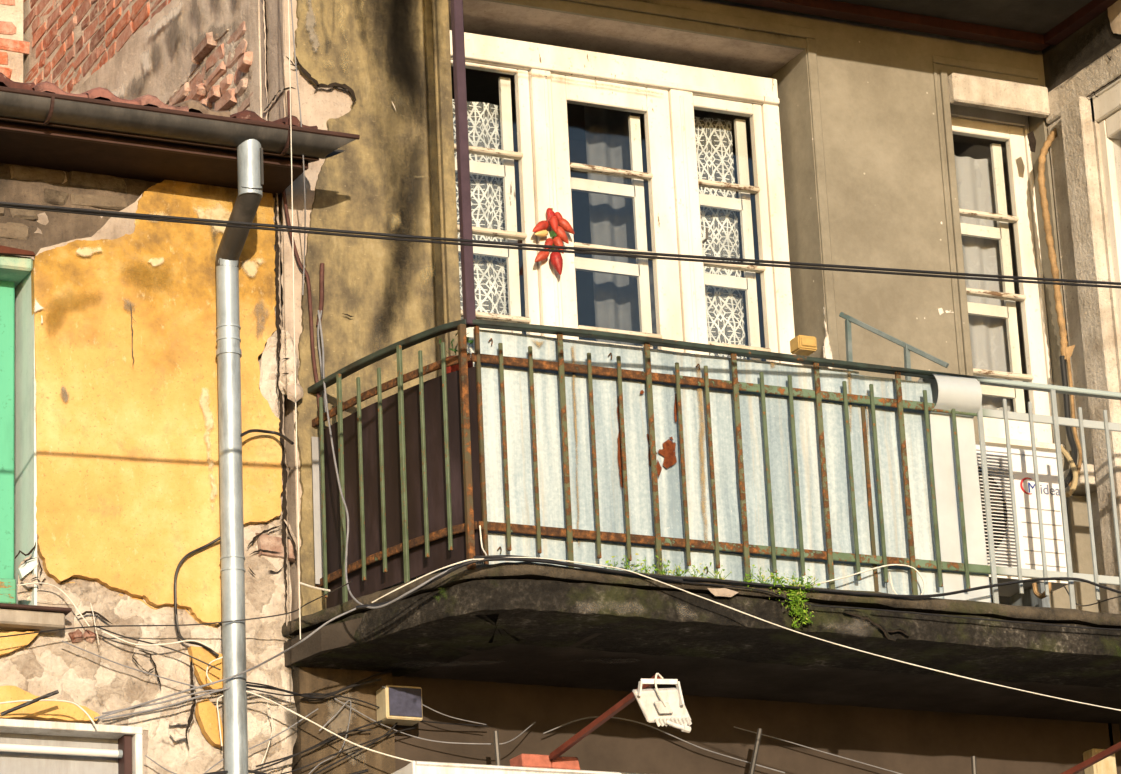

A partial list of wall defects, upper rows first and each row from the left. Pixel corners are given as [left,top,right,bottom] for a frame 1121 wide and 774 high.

water stain [112,0,236,97]
spalling [165,21,253,113]
spalling [283,56,353,130]
water stain [360,0,420,116]
peeling [196,205,231,232]
peeling [243,259,262,277]
spalling [281,158,323,368]
water stain [375,141,420,350]
corrosion [647,434,677,476]
corrosion [698,370,707,540]
spalling [0,552,225,774]